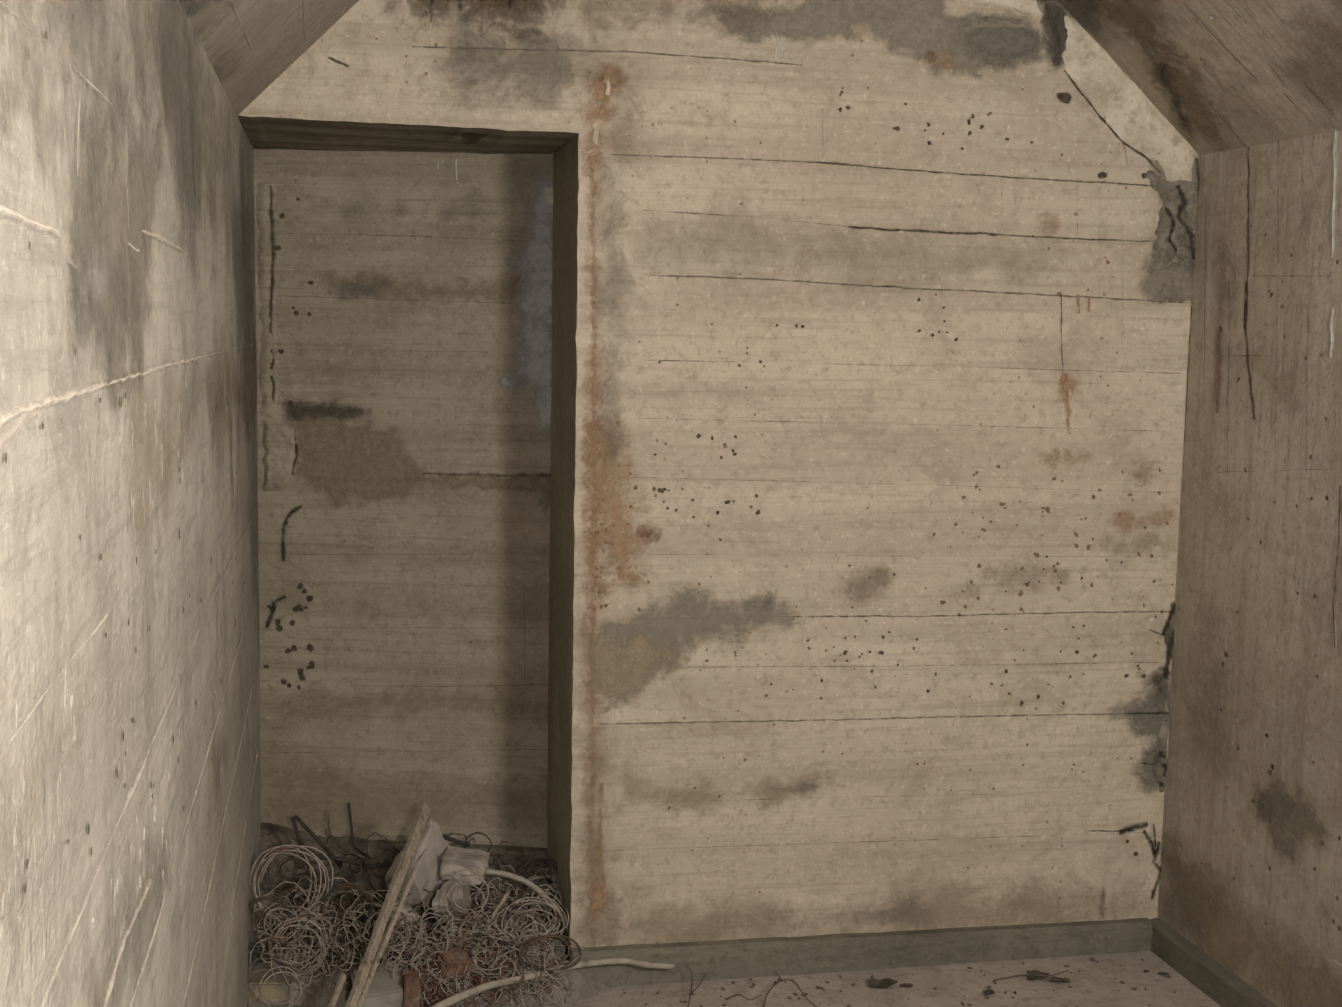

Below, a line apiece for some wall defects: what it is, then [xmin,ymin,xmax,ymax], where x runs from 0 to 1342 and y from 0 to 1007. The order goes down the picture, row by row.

water stain [410,0,570,91]
corrosion [586,65,626,174]
crack [611,70,1160,186]
spalling [1056,92,1071,104]
water stain [1036,0,1222,151]
water stain [70,0,230,408]
spalling [1142,158,1200,441]
water stain [285,403,550,506]
corrosion [585,420,660,611]
water stain [593,589,792,699]
spalling [1149,600,1176,680]
spalling [1151,841,1162,900]